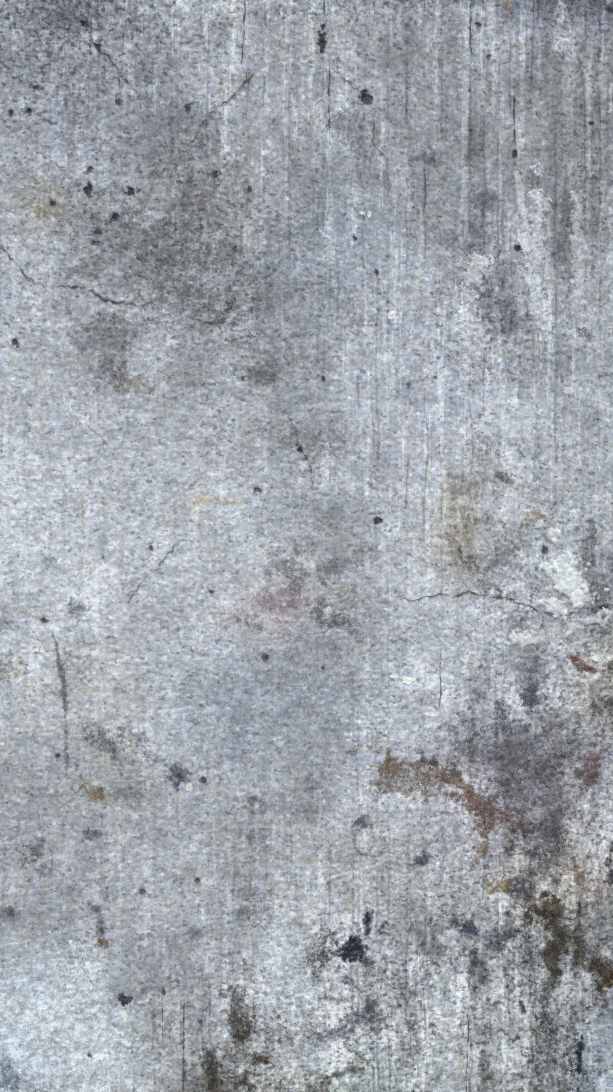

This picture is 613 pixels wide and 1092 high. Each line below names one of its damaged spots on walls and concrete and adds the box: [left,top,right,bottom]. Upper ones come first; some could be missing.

crack [0,245,155,306]
crack [400,590,613,616]
rust [537,745,610,793]
rust [376,748,495,863]
rust [483,875,515,894]
leakage [202,916,382,1092]
leakage [334,906,387,963]
leakage [439,829,613,1092]
rust [524,891,568,977]
rust [587,963,613,1011]